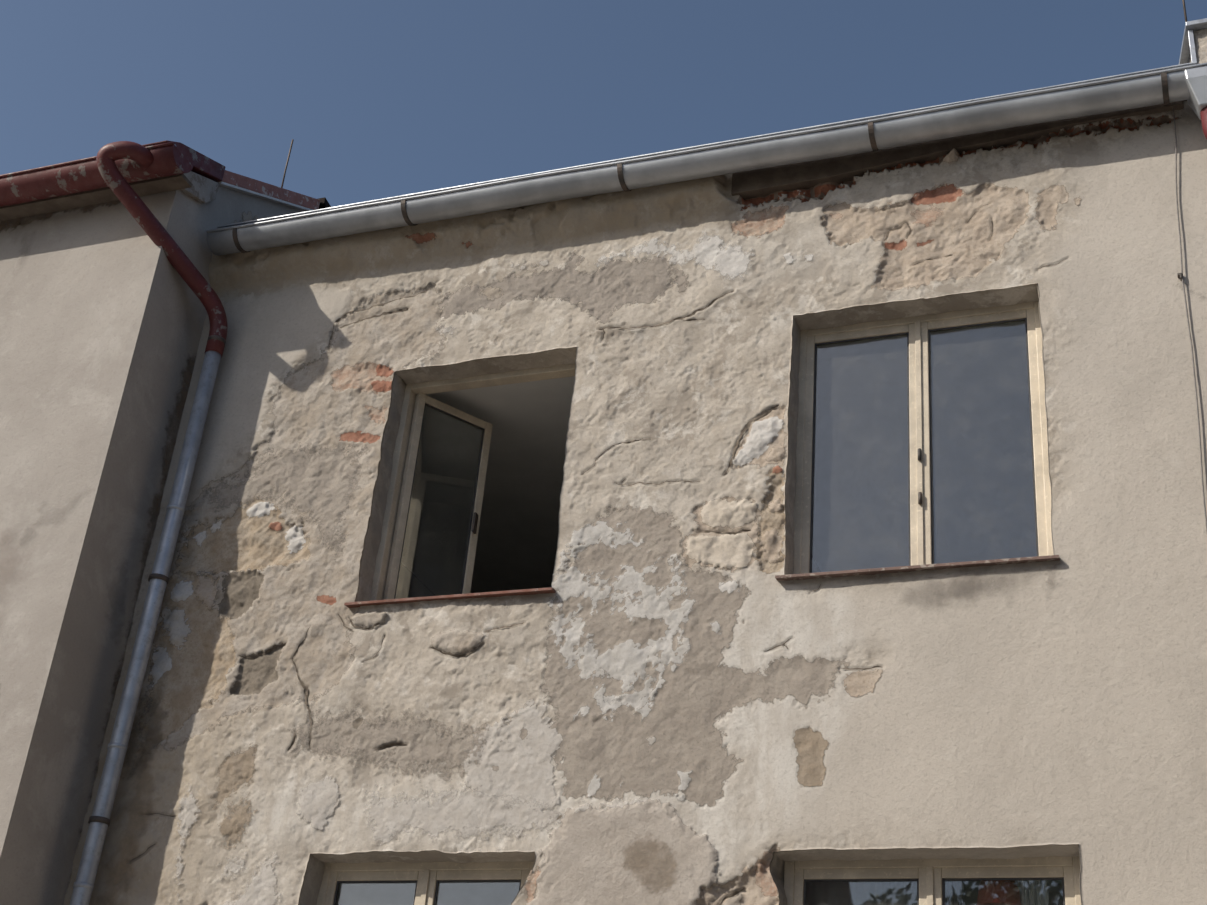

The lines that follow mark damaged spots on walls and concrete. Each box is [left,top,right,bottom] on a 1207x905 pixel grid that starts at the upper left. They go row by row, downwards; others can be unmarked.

crack [327,284,436,353]
crack [599,290,734,340]
crack [583,438,700,486]
flaking render [132,115,1178,845]
crack [288,627,312,751]
flaking render [696,844,781,905]